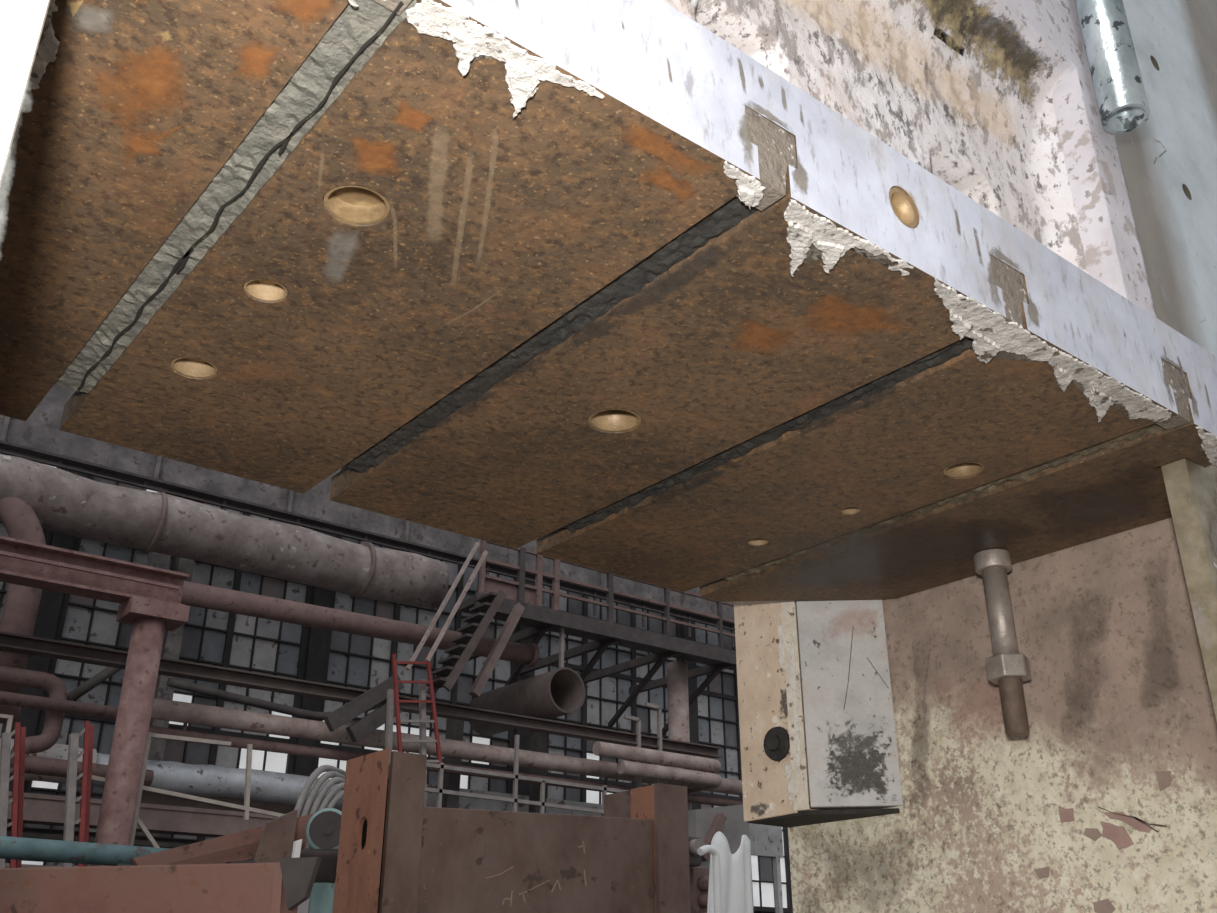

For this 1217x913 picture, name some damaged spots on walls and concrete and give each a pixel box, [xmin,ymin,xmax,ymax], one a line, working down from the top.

peeling [19,0,60,116]
crack [77,1,403,390]
peeling [784,199,914,277]
peeling [934,278,1172,423]
peeling [1196,426,1217,468]
peeling [1156,771,1171,791]
peeling [1058,806,1074,823]
peeling [1084,812,1151,850]
peeling [1093,899,1115,913]